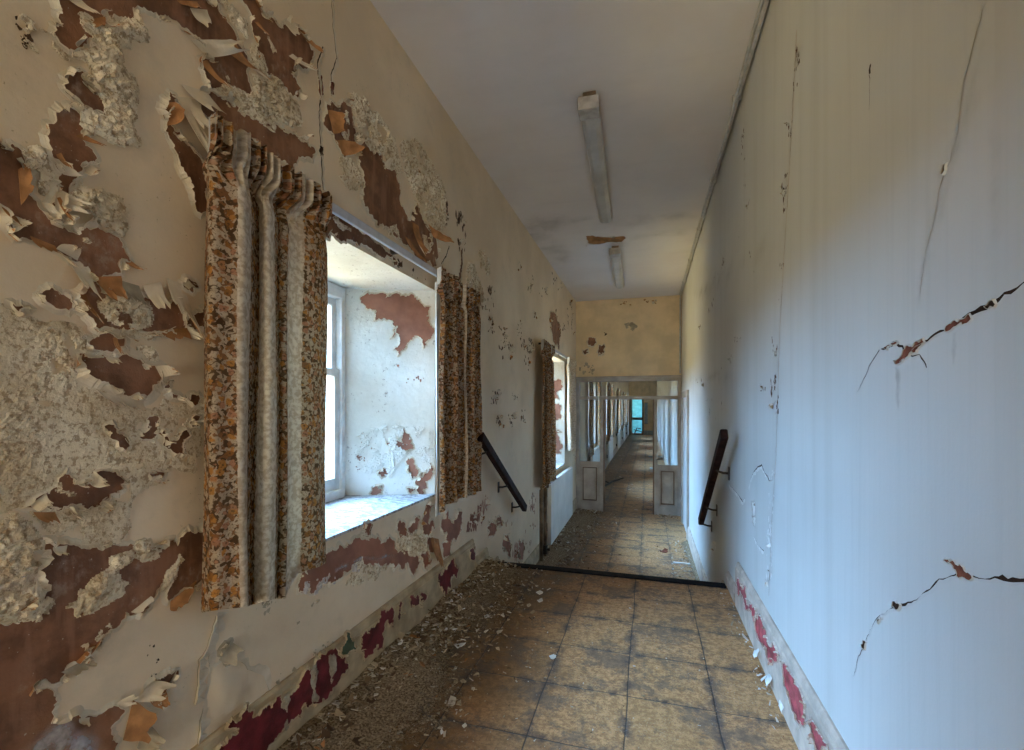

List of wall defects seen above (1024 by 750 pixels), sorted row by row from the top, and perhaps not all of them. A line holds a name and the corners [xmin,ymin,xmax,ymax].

peeling [0,0,466,459]
crack [317,0,339,191]
crack [857,282,1024,392]
crack [916,0,987,304]
peeling [0,467,203,750]
peeling [214,427,536,750]
peeling [735,576,829,750]
crack [853,557,1024,676]